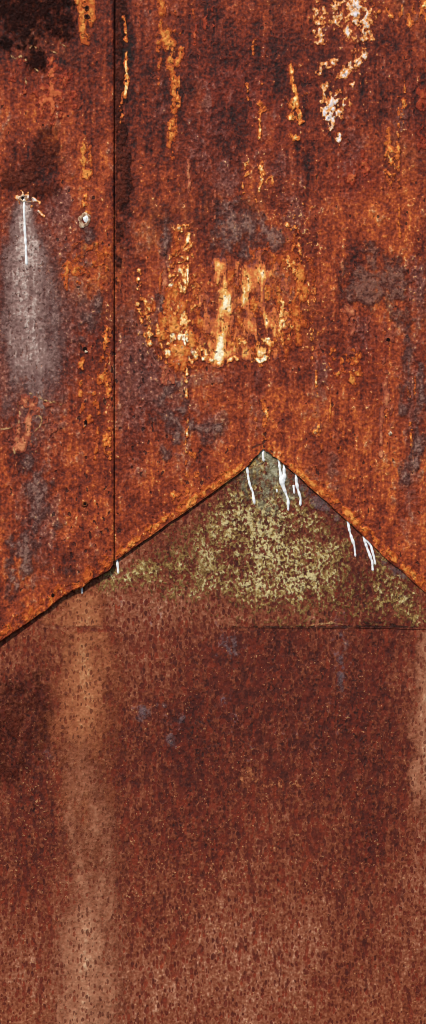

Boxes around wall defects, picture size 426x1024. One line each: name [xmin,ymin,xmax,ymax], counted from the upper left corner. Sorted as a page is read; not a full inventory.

corrosion [74,0,97,46]
corrosion [119,15,130,124]
corrosion [155,0,215,194]
corrosion [286,63,308,144]
corrosion [312,0,426,146]
corrosion [344,81,426,189]
corrosion [14,190,45,218]
corrosion [4,394,59,453]
water stain [0,127,65,420]
corrosion [77,324,112,460]
corrosion [135,203,395,458]
corrosion [249,398,426,591]